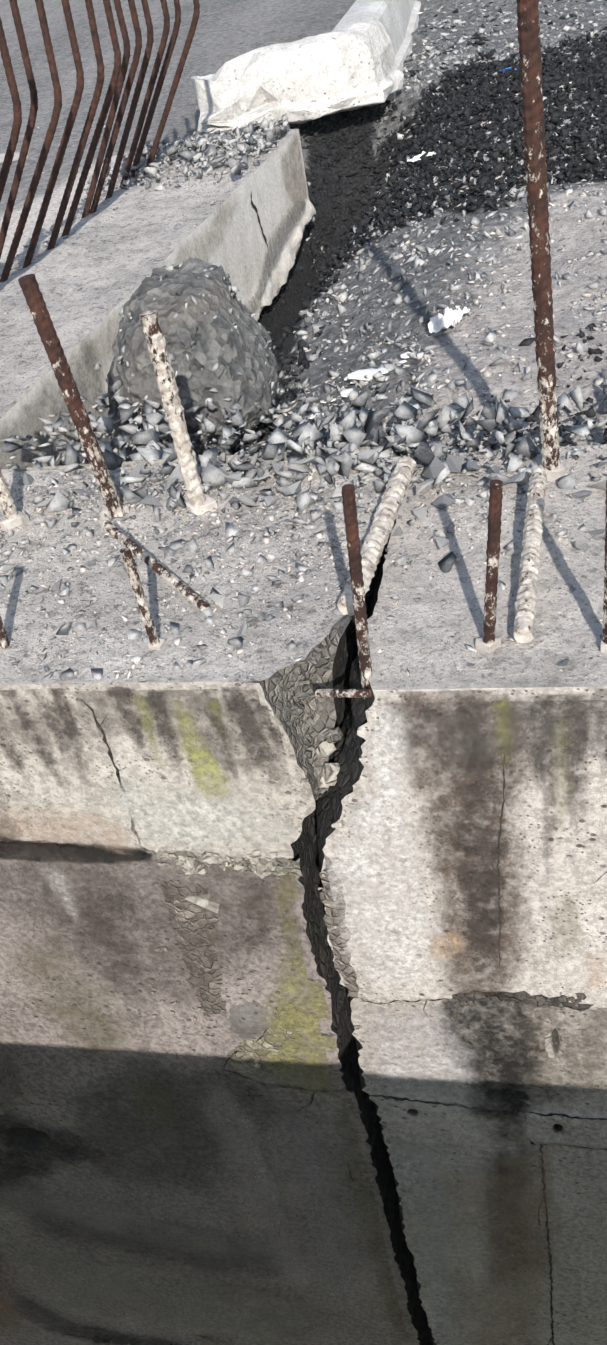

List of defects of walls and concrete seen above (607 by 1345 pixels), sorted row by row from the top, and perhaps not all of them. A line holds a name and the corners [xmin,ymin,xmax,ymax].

spalling [259,456,416,801]
leakage [3,688,78,766]
crack [81,699,140,843]
leakage [97,687,278,766]
crack [224,495,607,1345]
leakage [332,690,607,1119]
leakage [0,1115,100,1199]
leakage [16,1295,173,1345]